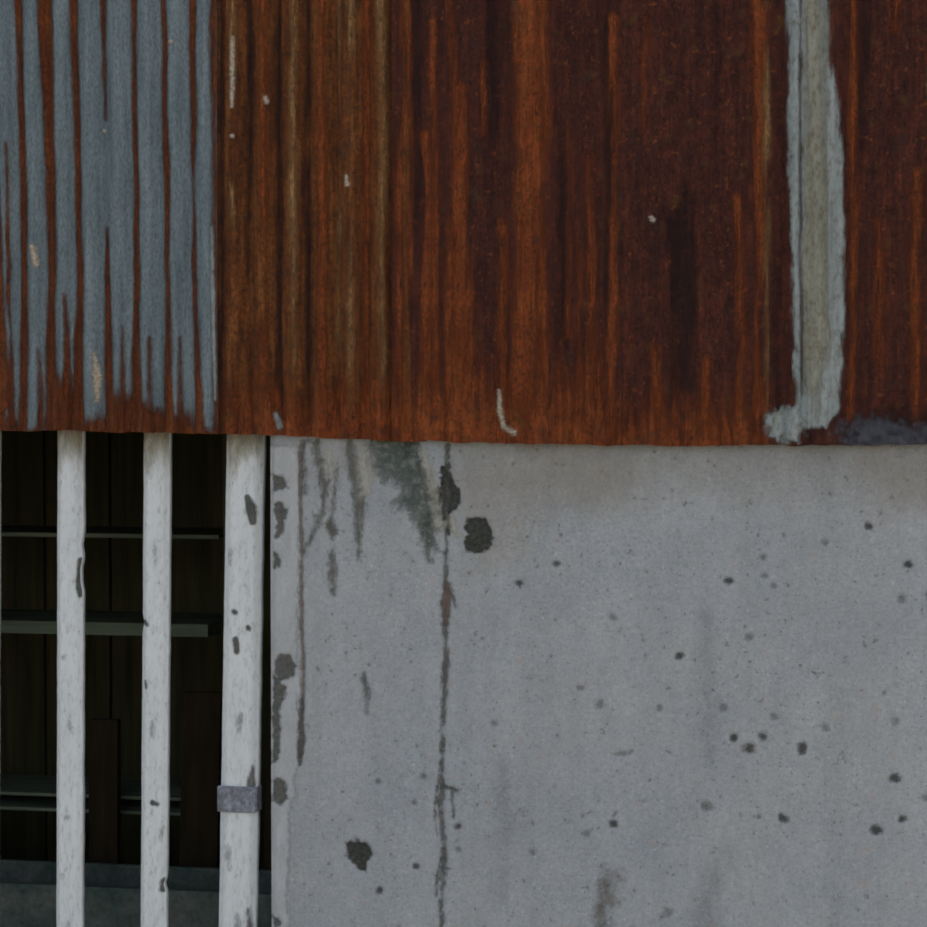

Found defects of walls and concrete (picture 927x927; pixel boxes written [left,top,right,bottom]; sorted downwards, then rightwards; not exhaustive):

rust [0,0,780,457]
rust [846,0,927,446]
damp [328,551,337,595]
damp [299,439,458,561]
spalling [464,517,494,553]
crack [434,444,459,927]
spalling [346,839,372,871]